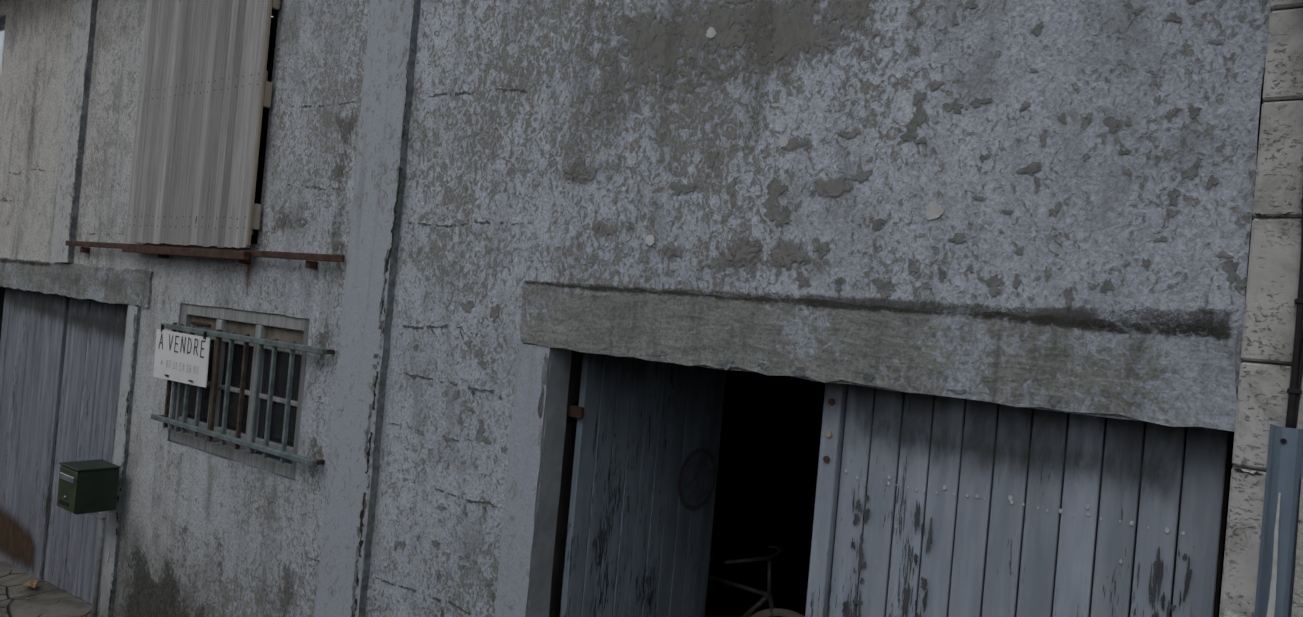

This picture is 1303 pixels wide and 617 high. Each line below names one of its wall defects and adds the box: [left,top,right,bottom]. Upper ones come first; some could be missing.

leakage [585,0,923,131]
crack [351,62,550,617]
peeling [842,486,870,617]
peeling [903,501,933,617]